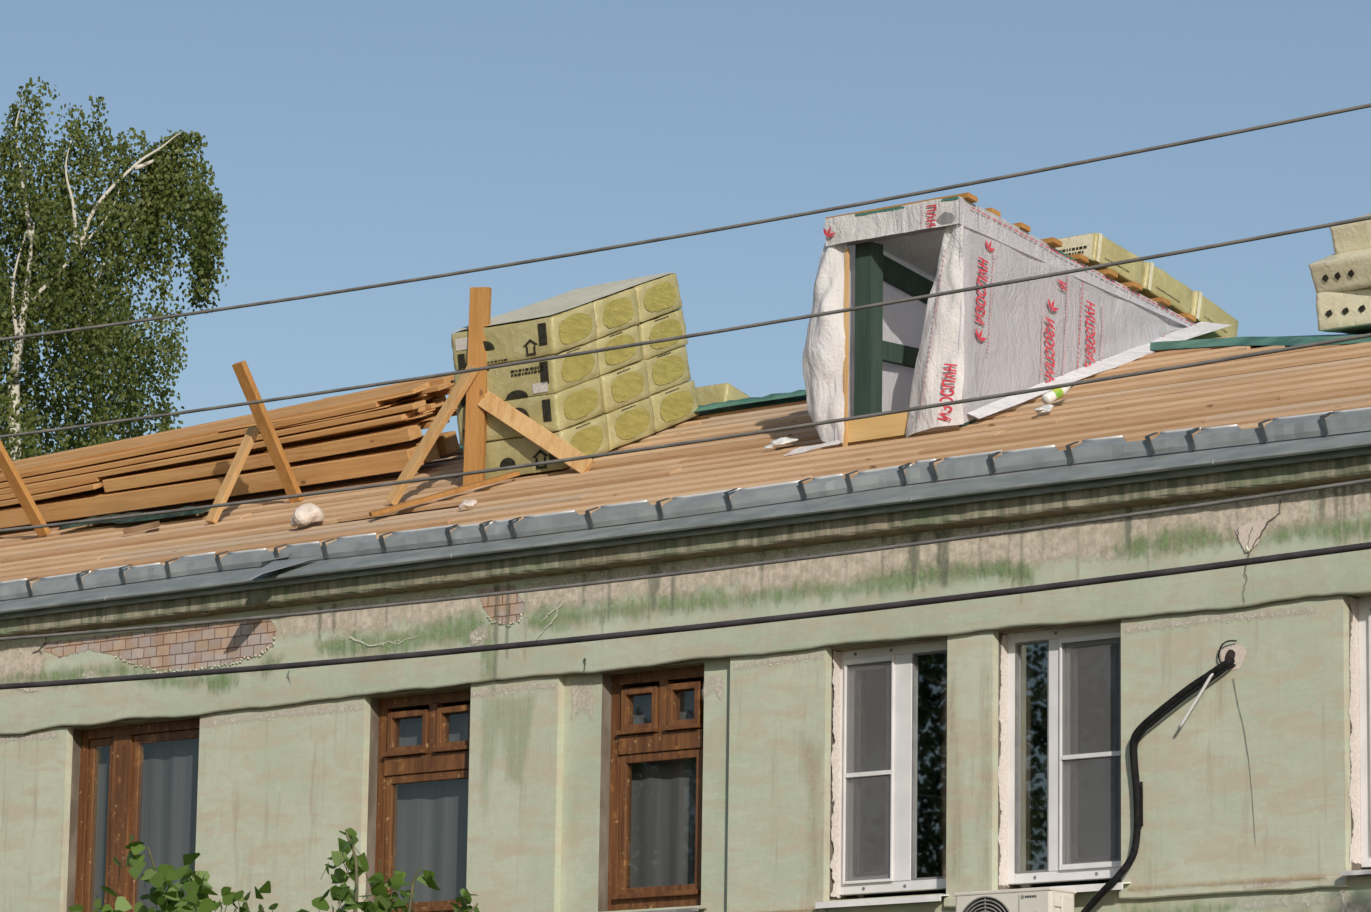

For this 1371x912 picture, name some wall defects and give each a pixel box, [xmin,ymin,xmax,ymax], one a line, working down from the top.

water stain [1116,508,1220,558]
water stain [496,567,727,627]
flaking render [0,484,1371,698]
water stain [775,532,1029,601]
water stain [321,613,497,654]
peeling [201,704,363,726]